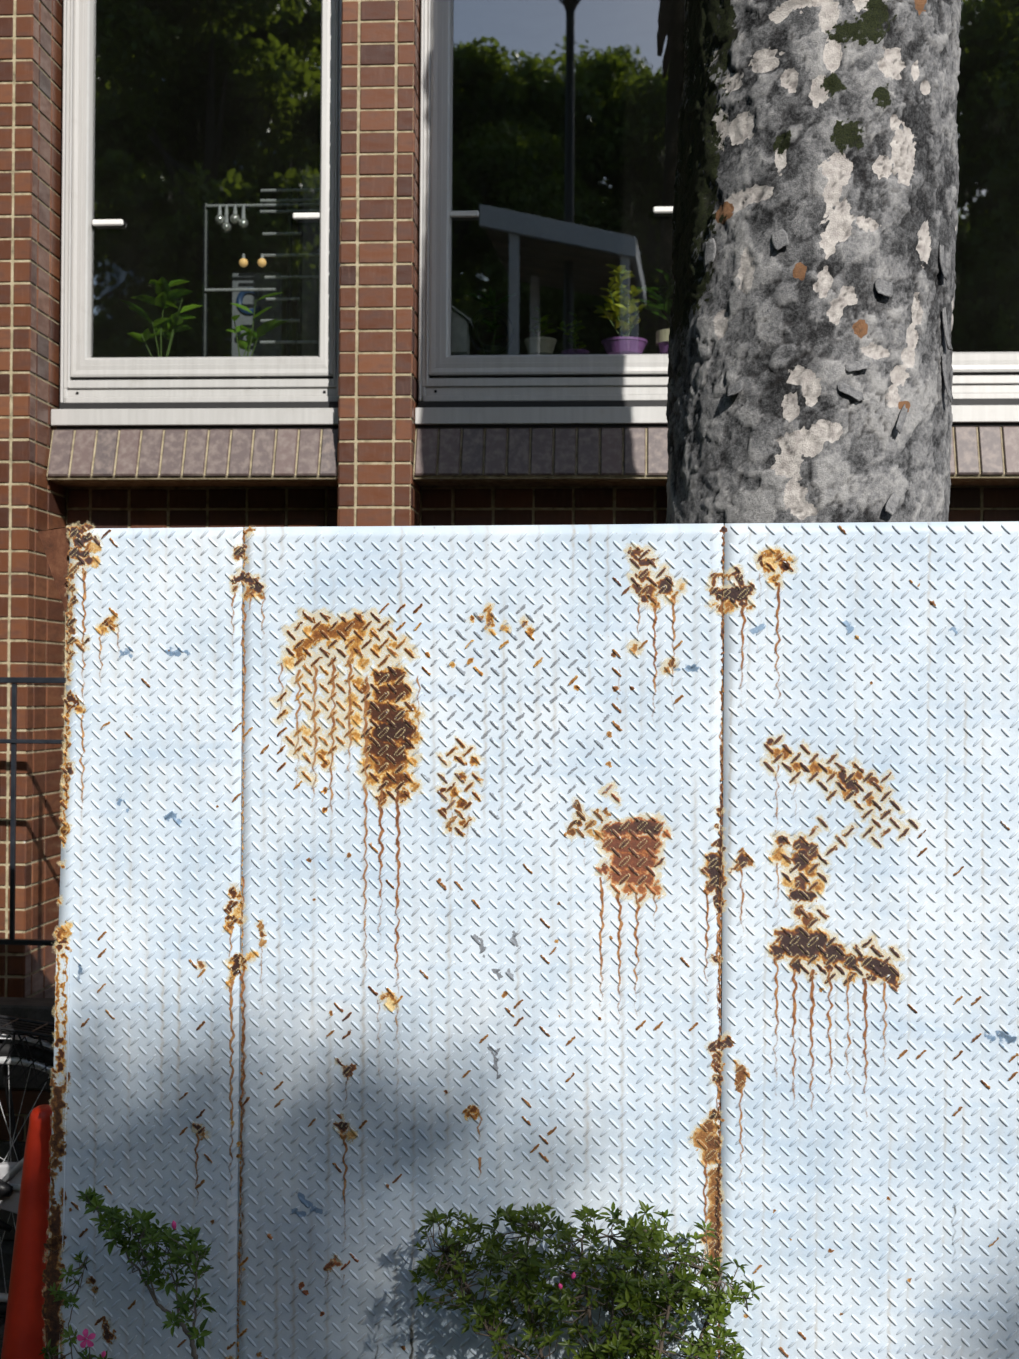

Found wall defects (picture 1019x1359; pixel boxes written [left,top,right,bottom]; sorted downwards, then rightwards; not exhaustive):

corrosion [54,921,73,952]
corrosion [59,523,119,847]
corrosion [216,526,267,1359]
corrosion [326,1002,352,1039]
corrosion [260,603,431,1027]
corrosion [323,1058,368,1283]
corrosion [437,737,484,836]
corrosion [462,1105,482,1135]
corrosion [564,784,671,995]
corrosion [606,547,687,738]
corrosion [680,526,927,1289]